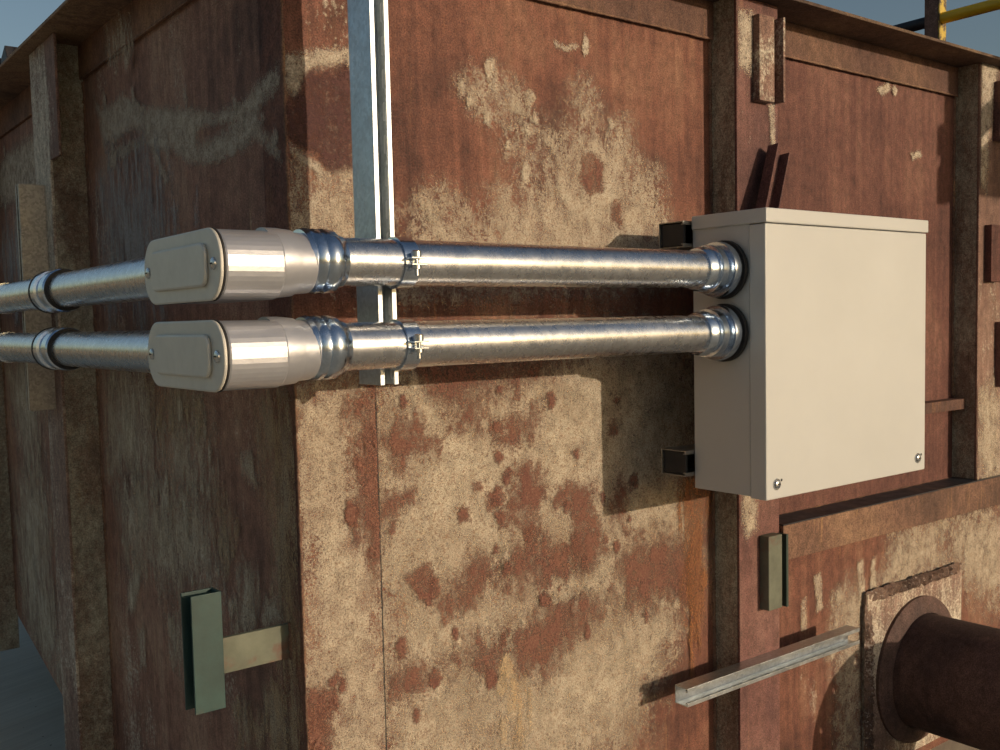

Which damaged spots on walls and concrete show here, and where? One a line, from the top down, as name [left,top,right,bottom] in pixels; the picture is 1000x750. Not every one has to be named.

peeling [738,9,753,78]
peeling [394,58,674,249]
peeling [396,287,670,308]
corrosion [307,670,346,750]
corrosion [340,360,712,746]
peeling [801,506,1000,750]